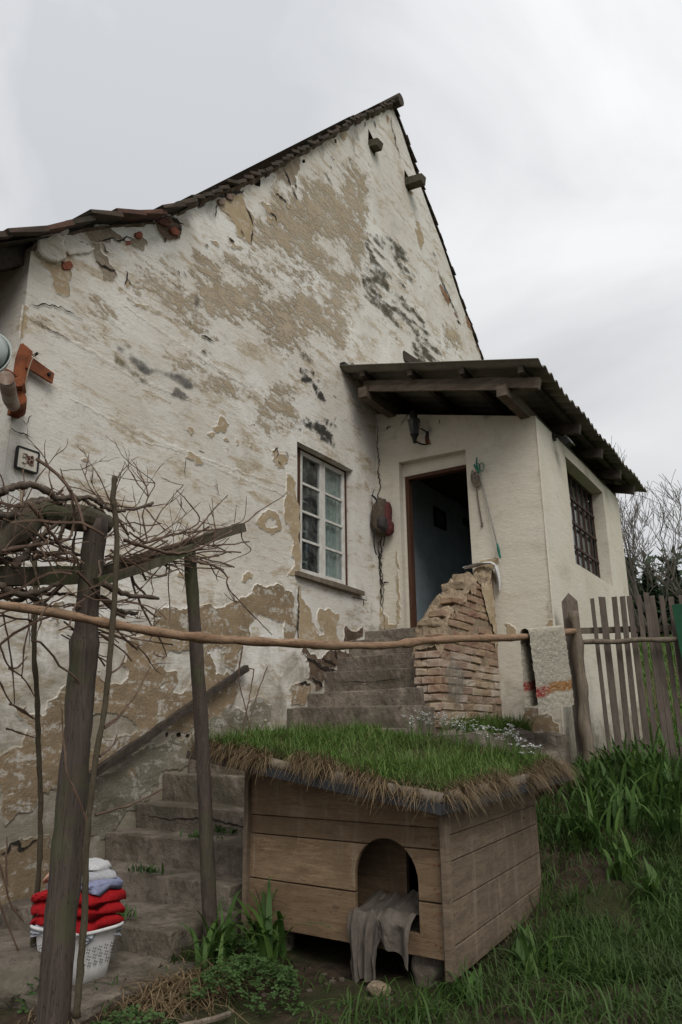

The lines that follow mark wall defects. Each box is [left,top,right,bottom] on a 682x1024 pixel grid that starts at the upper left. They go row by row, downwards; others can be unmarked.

peeling [415,220,424,250]
flaking render [39,255,73,298]
peeling [438,283,481,357]
leakage [118,347,193,399]
leakage [299,367,326,401]
leakage [295,417,336,448]
flaking render [83,154,371,845]
flaking render [0,684,66,827]
crack [146,815,244,828]
flaking render [0,834,51,914]